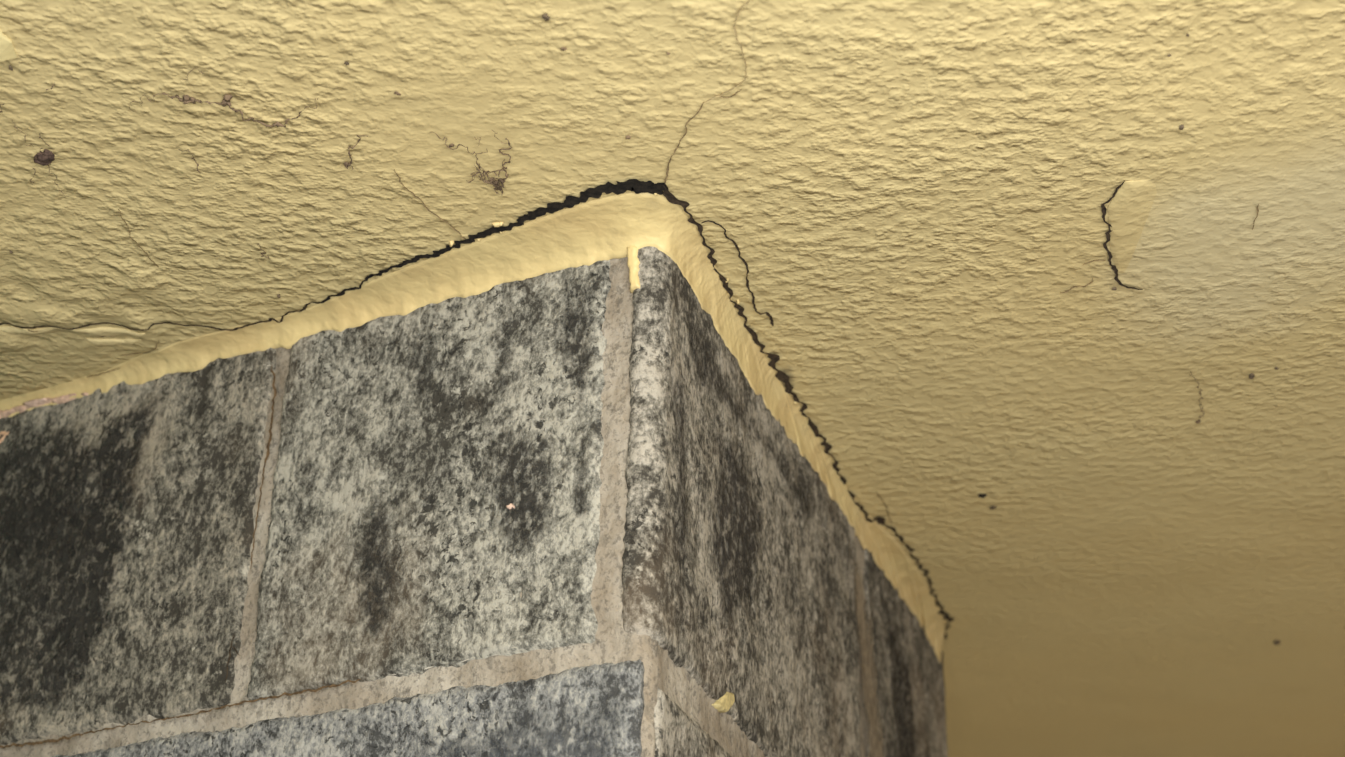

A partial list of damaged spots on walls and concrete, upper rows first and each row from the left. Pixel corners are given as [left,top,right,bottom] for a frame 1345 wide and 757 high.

crack [0,0,954,639]
crack [1060,181,1143,293]
leakage [0,400,155,713]